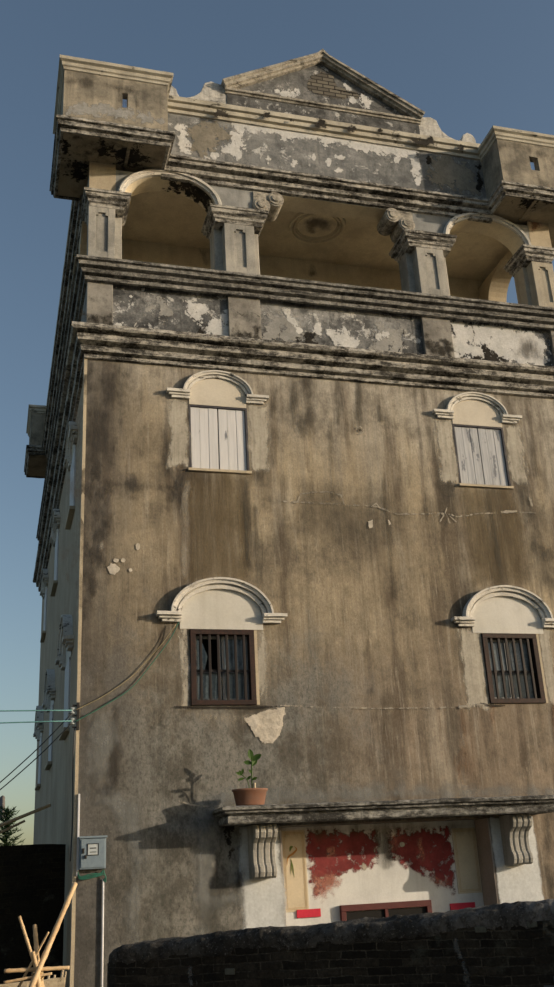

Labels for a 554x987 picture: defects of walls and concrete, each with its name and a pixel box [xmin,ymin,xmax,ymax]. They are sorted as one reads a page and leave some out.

peeling [274,71,373,109]
peeling [66,102,422,186]
peeling [183,300,229,336]
peeling [262,308,408,352]
peeling [450,320,552,366]
water stain [292,377,313,430]
water stain [76,369,120,498]
water stain [172,476,258,579]
crack [283,491,535,523]
spalling [245,707,286,744]
peeling [305,826,455,896]
crack [454,938,469,987]